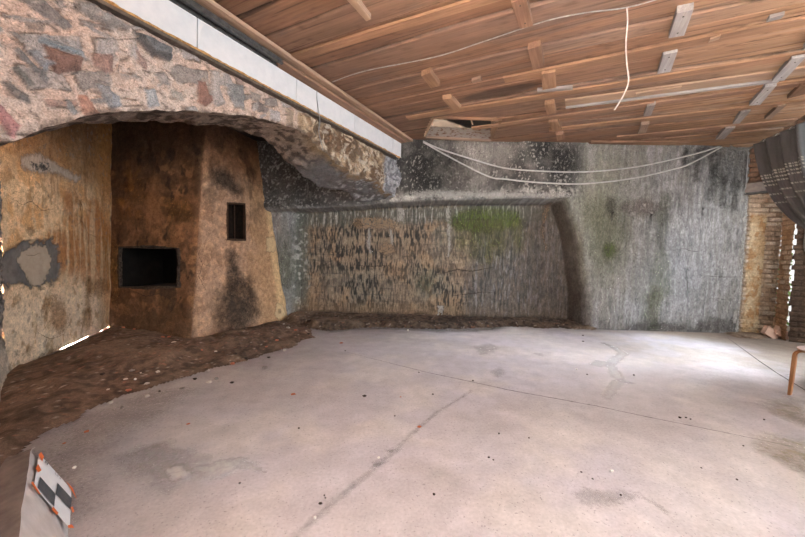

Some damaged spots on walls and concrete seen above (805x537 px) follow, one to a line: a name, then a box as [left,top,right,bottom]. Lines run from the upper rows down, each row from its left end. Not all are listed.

leakage [682,147,740,211]
leakage [413,189,569,262]
flaking render [1,236,62,290]
leakage [227,259,250,294]